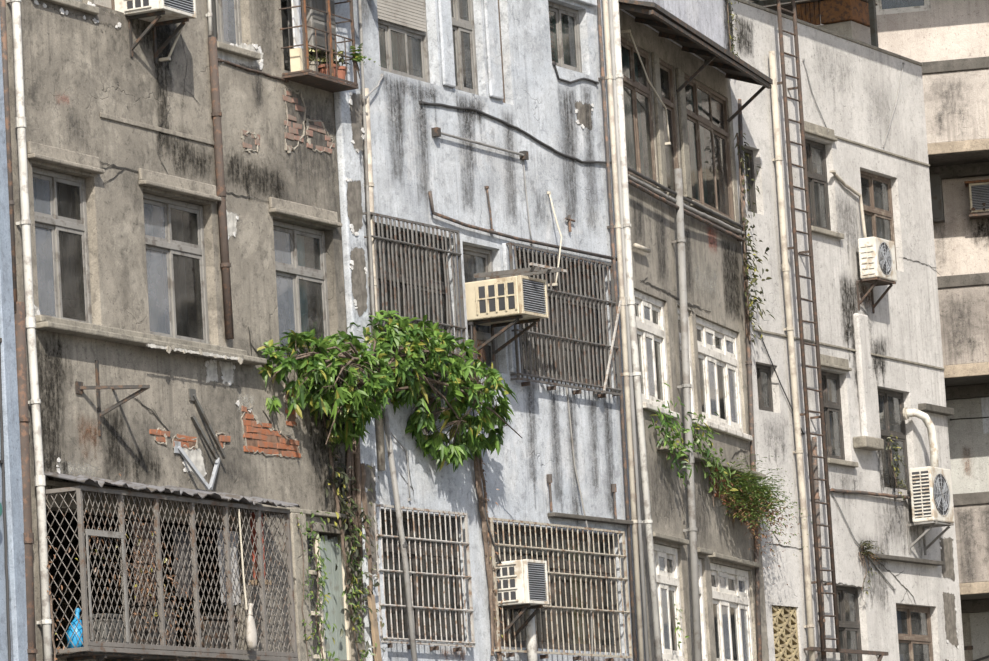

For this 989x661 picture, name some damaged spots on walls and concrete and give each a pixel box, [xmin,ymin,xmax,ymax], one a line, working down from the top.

damp [132,20,210,173]
damp [228,155,284,199]
spalling [282,87,335,155]
damp [385,81,435,187]
damp [457,100,481,202]
damp [563,92,592,213]
damp [971,218,989,242]
damp [840,278,867,386]
peeling [149,427,207,477]
spalling [216,431,231,449]
spalling [235,383,302,459]